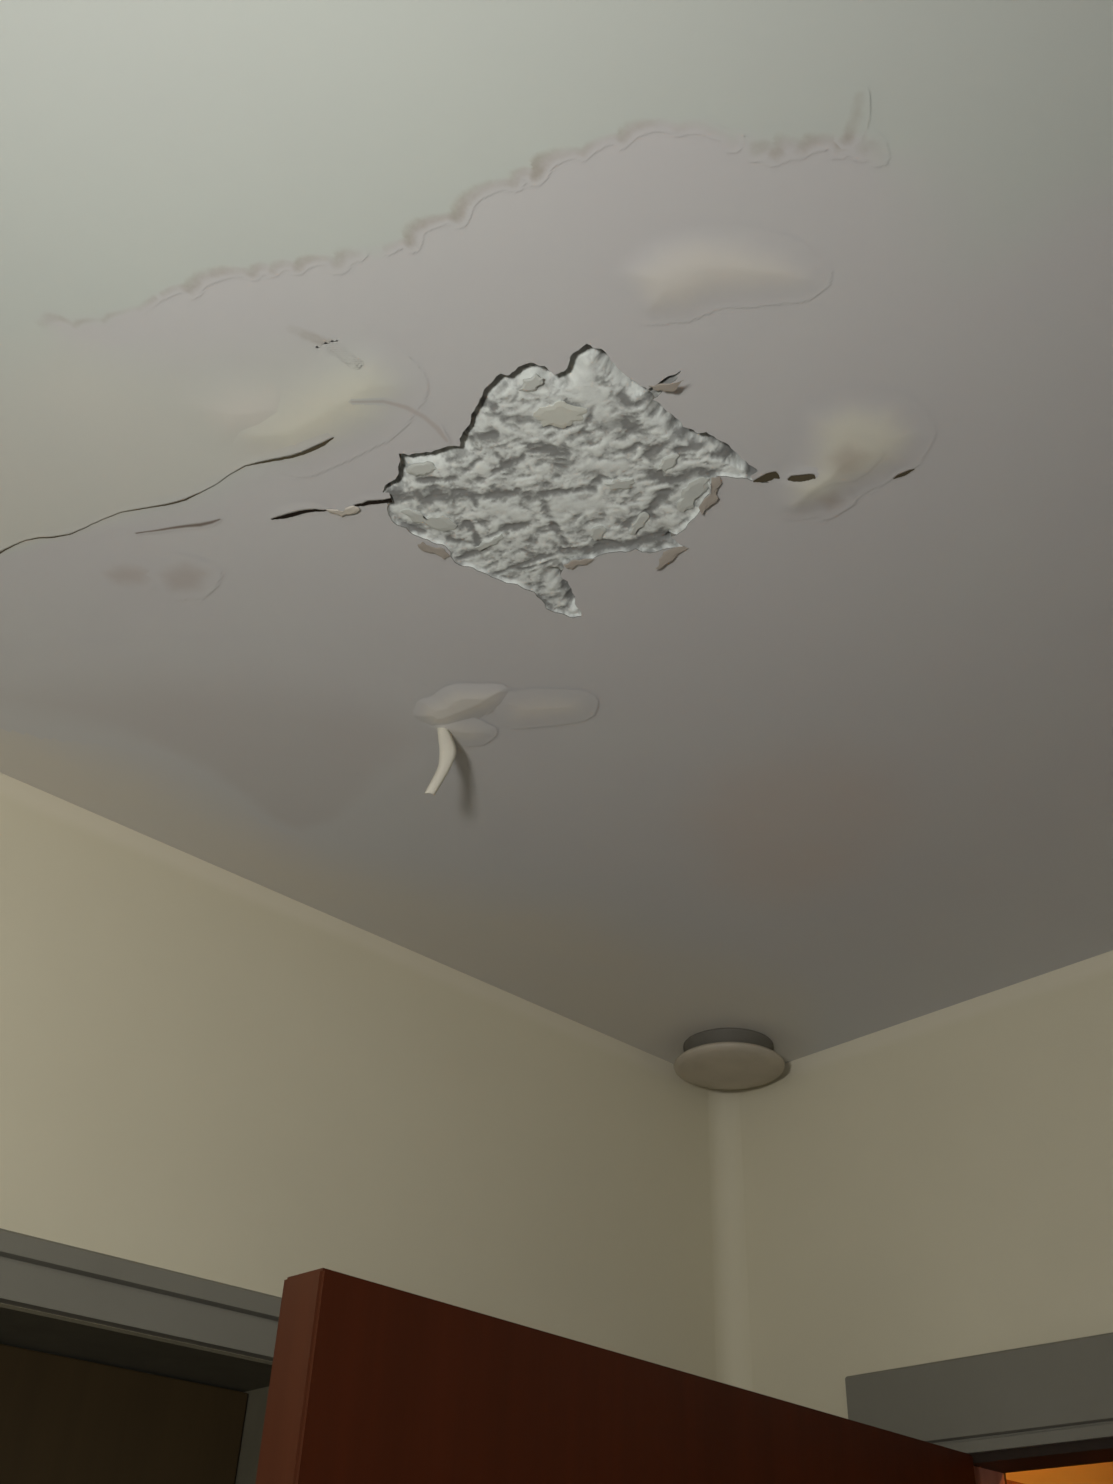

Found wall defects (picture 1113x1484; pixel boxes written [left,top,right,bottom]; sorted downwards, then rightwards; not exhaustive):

crack [349,397,451,444]
crack [0,433,334,554]
crack [268,493,392,520]
flaking render [383,344,769,618]
crack [751,466,819,482]
crack [889,464,914,479]
water stain [0,86,1113,1064]
peeling [411,682,599,747]